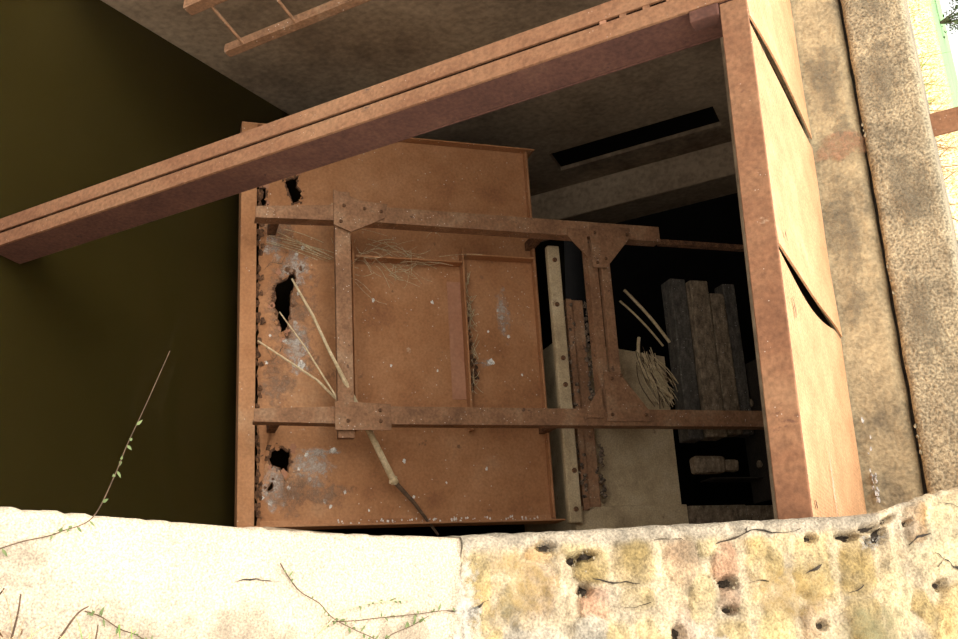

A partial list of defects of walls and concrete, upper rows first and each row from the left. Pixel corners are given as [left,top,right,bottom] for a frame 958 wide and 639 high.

corrosion [262,286,314,407]
corrosion [467,303,480,390]
corrosion [258,427,345,508]
crack [716,528,801,544]
crack [909,533,958,569]